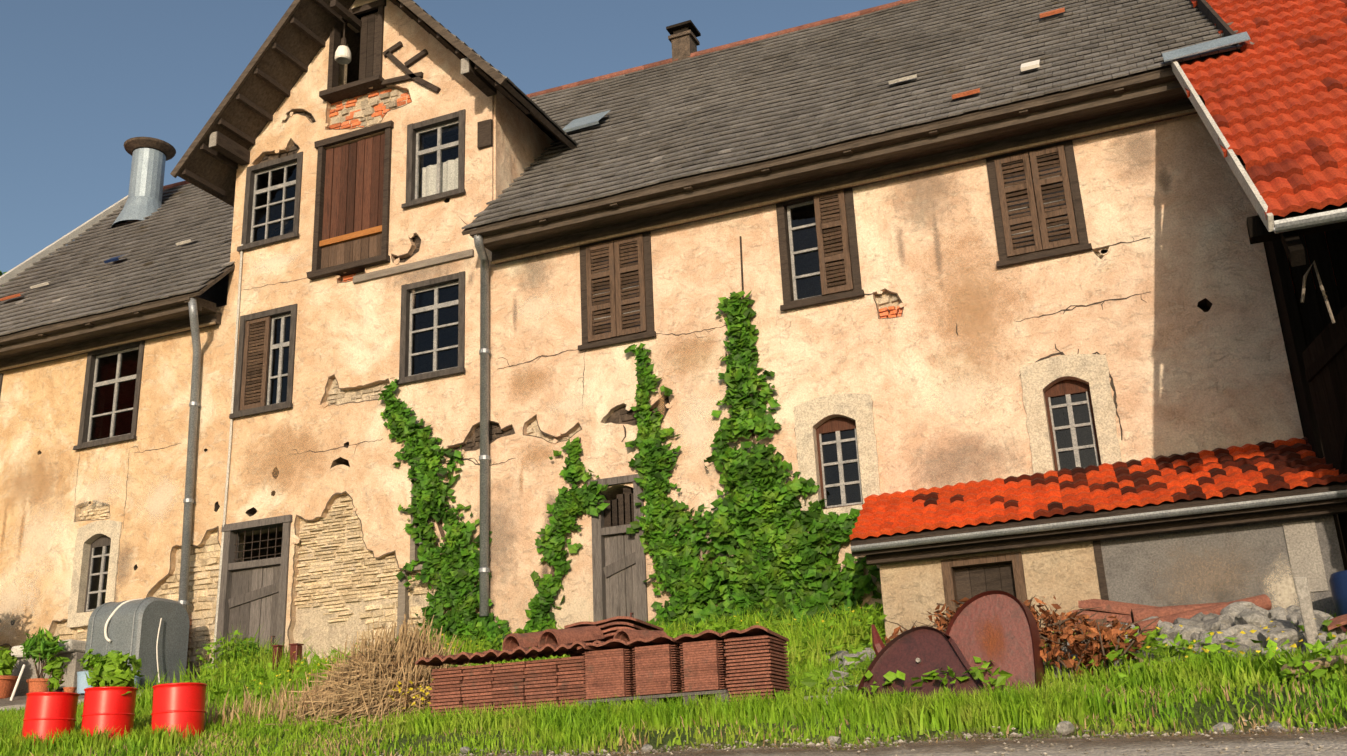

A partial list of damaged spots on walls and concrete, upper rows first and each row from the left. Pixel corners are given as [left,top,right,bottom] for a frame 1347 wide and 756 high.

flaking render [282,84,412,130]
flaking render [253,138,300,165]
flaking render [873,289,906,319]
crack [1016,292,1149,440]
flaking render [320,375,390,407]
flaking render [601,395,672,426]
flaking render [441,414,582,456]
flaking render [287,491,438,666]
flaking render [144,526,221,682]
flaking render [49,619,88,641]